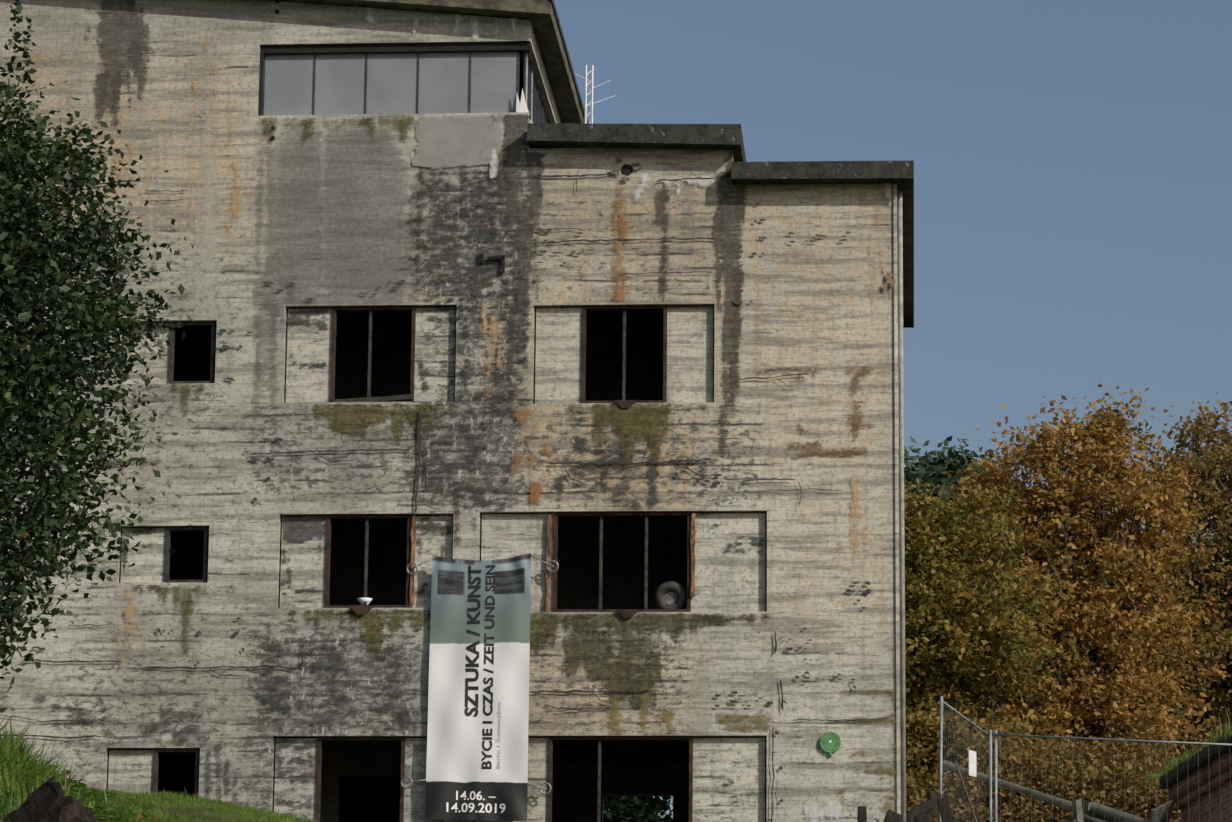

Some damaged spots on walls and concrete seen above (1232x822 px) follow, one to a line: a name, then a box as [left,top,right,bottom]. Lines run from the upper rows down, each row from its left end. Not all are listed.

leakage [87,0,154,126]
corrosion [612,188,629,301]
leakage [313,114,546,545]
leakage [555,152,747,509]
leakage [530,613,755,732]